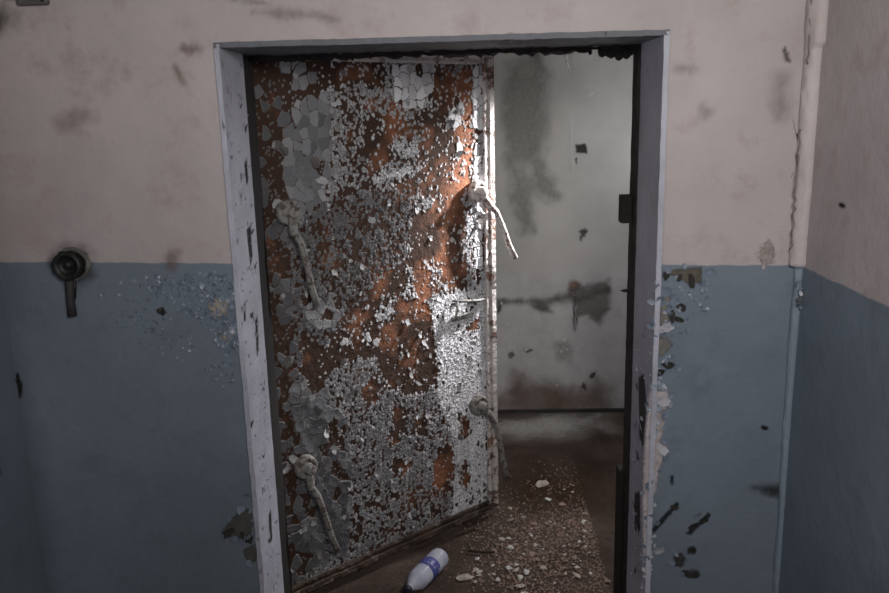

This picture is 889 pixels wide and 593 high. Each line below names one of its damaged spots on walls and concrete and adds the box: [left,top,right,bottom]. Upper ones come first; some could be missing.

peeling [443,105,480,139]
water stain [505,53,543,225]
peeling [310,149,367,211]
peeling [226,63,267,365]
peeling [402,200,421,240]
peeling [475,203,485,229]
peeling [282,454,298,474]
peeling [312,412,337,473]
peeling [441,379,472,420]
peeling [631,263,715,589]
peeling [221,454,280,585]